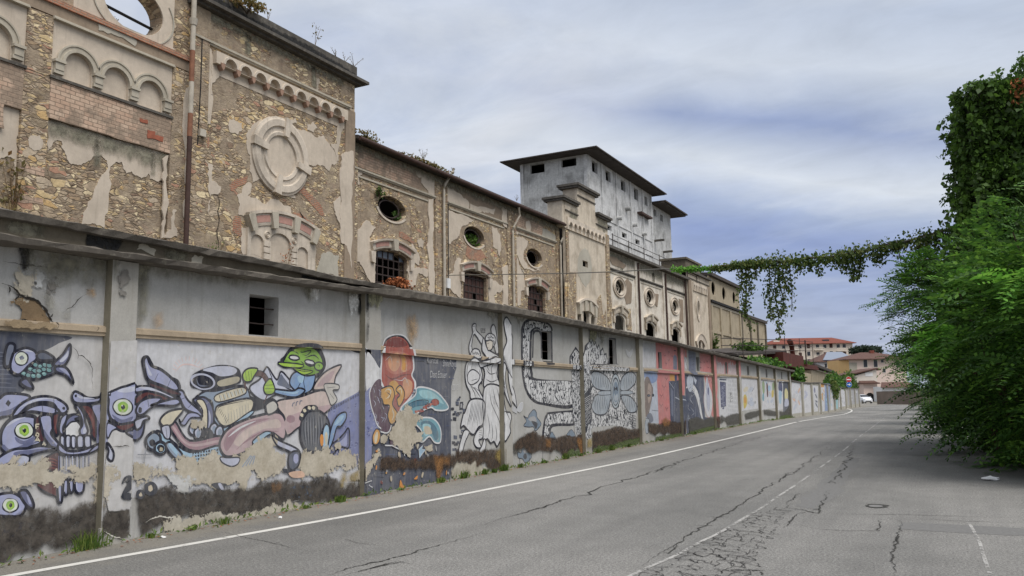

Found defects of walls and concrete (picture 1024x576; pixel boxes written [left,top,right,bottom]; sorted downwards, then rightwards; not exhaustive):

flaking render [10,267,61,323]
peeling [0,403,433,508]
damp [380,405,790,471]
damp [0,475,360,562]